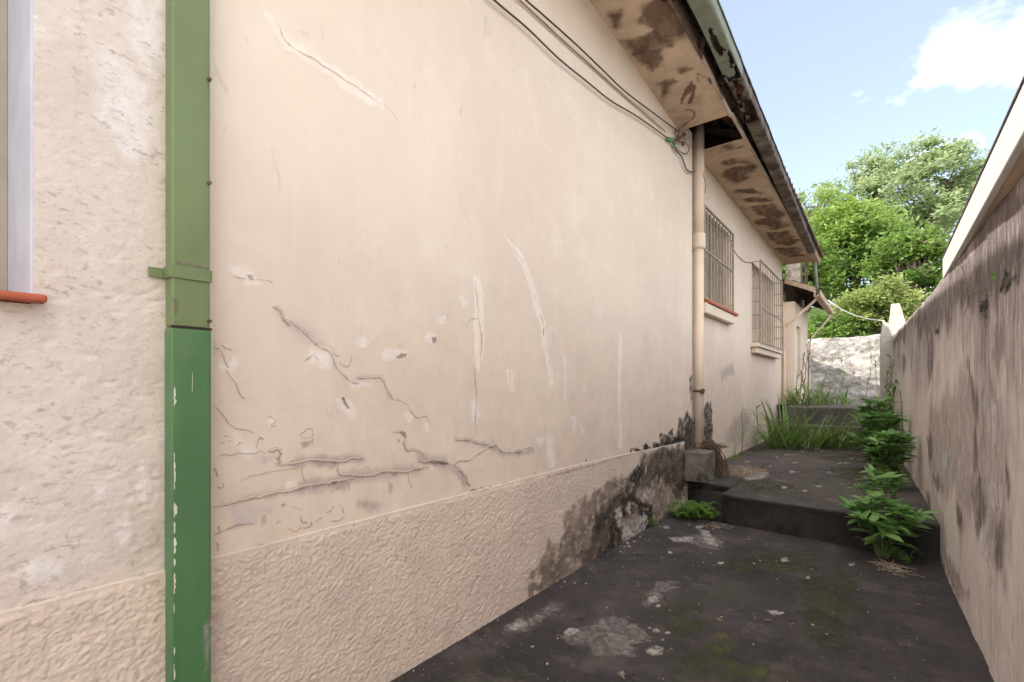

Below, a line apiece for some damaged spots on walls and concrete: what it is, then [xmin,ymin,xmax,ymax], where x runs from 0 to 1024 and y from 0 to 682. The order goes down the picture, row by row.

crack [257,1,387,112]
water stain [627,0,685,69]
water stain [661,69,696,111]
water stain [723,145,805,257]
crack [213,274,536,545]
water stain [528,333,724,599]
water stain [927,364,1009,594]